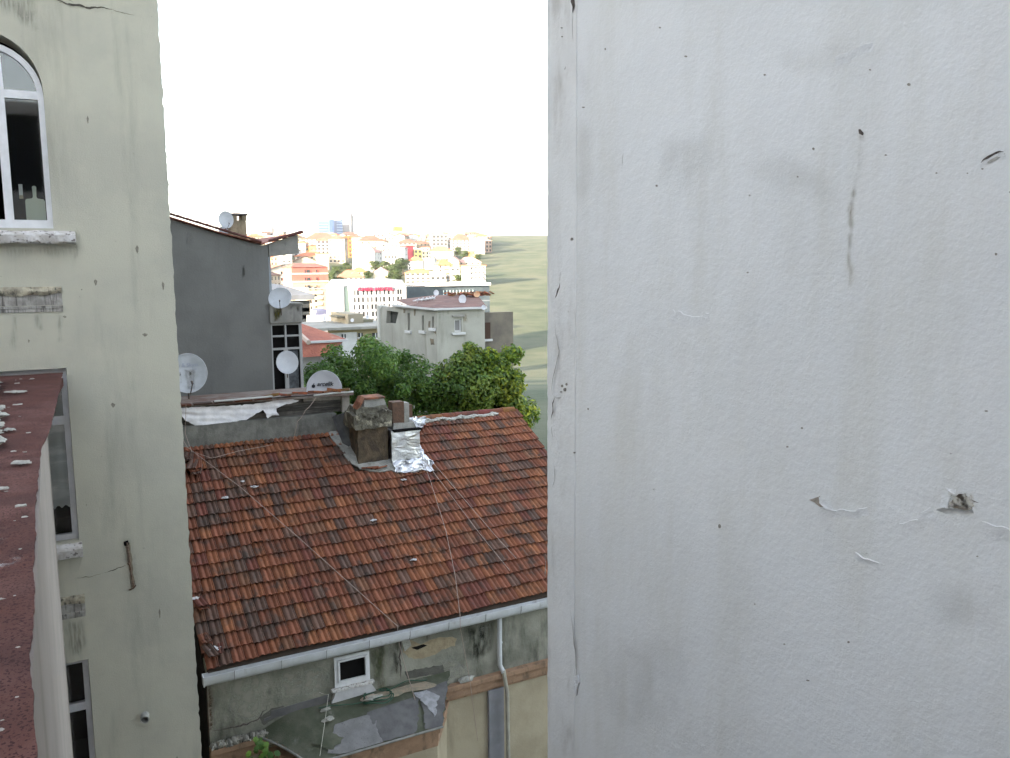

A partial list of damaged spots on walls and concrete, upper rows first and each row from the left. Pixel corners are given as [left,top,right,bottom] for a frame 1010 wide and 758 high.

crack [56,0,131,15]
flaking render [937,487,978,514]
flaking render [401,636,457,679]